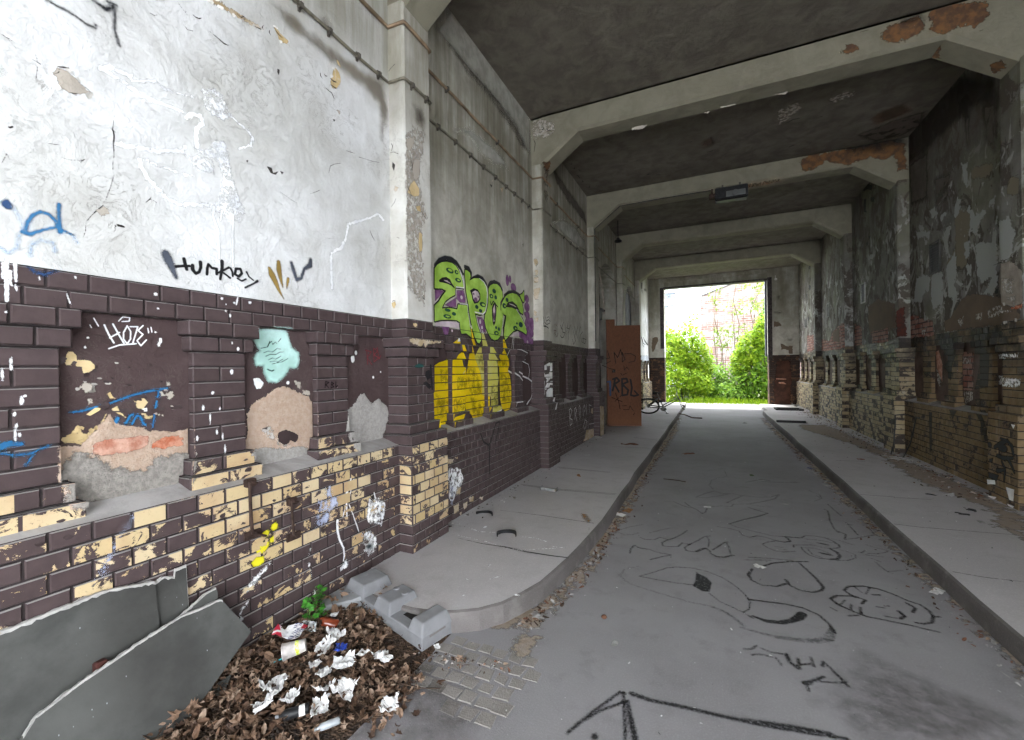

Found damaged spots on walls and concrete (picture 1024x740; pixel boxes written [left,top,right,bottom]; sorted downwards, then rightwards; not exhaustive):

flaking render [390,127,428,303]
spalling [807,323,845,352]
peeling [895,162,1023,339]
spalling [0,352,483,739]